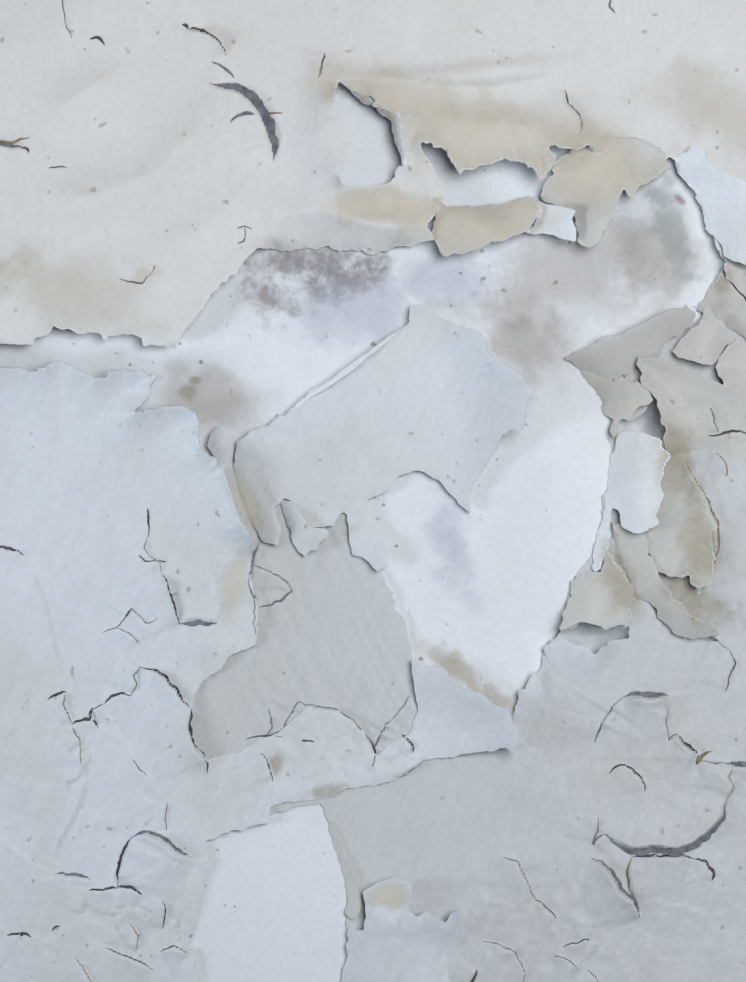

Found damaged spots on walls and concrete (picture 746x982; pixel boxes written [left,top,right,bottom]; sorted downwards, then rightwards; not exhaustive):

crack [0,137,29,153]
crack [182,23,283,160]
damp [351,78,550,161]
damp [563,135,632,193]
peeling [0,26,746,683]
crack [709,408,746,476]
crack [47,508,217,773]
crack [247,697,424,781]
peeling [399,659,544,760]
crack [591,691,746,918]
crack [54,801,190,971]
peeling [329,822,462,982]